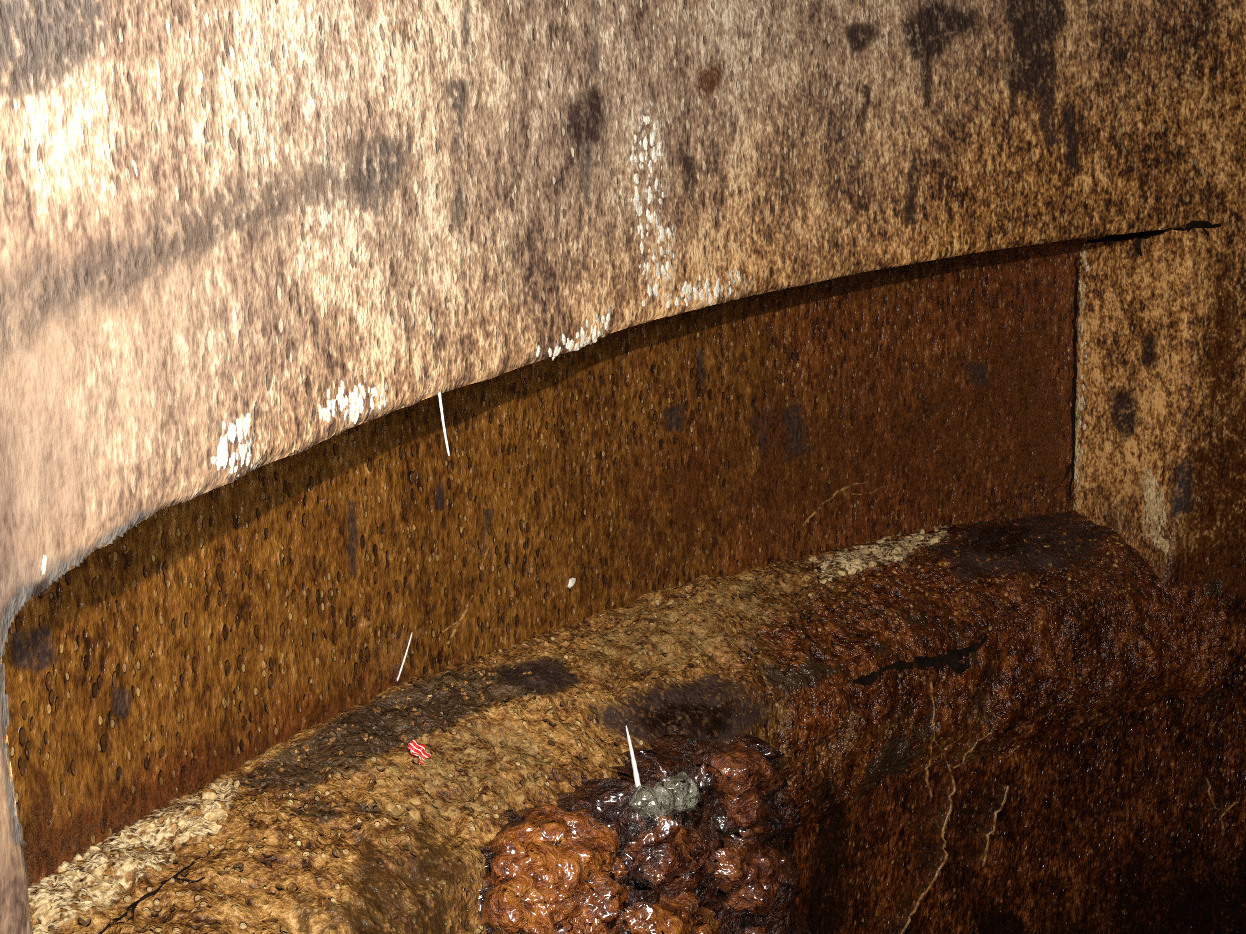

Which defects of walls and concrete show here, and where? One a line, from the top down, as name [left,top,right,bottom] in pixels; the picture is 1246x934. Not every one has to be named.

damp [697,64,722,93]
damp [847,24,876,51]
damp [901,0,980,106]
damp [1003,0,1077,170]
damp [569,87,602,198]
damp [630,104,746,308]
damp [906,152,917,224]
efflorescence [318,380,386,424]
efflorescence [211,413,254,477]
damp [591,677,766,745]
crack [854,634,998,934]
crack [982,786,1009,867]